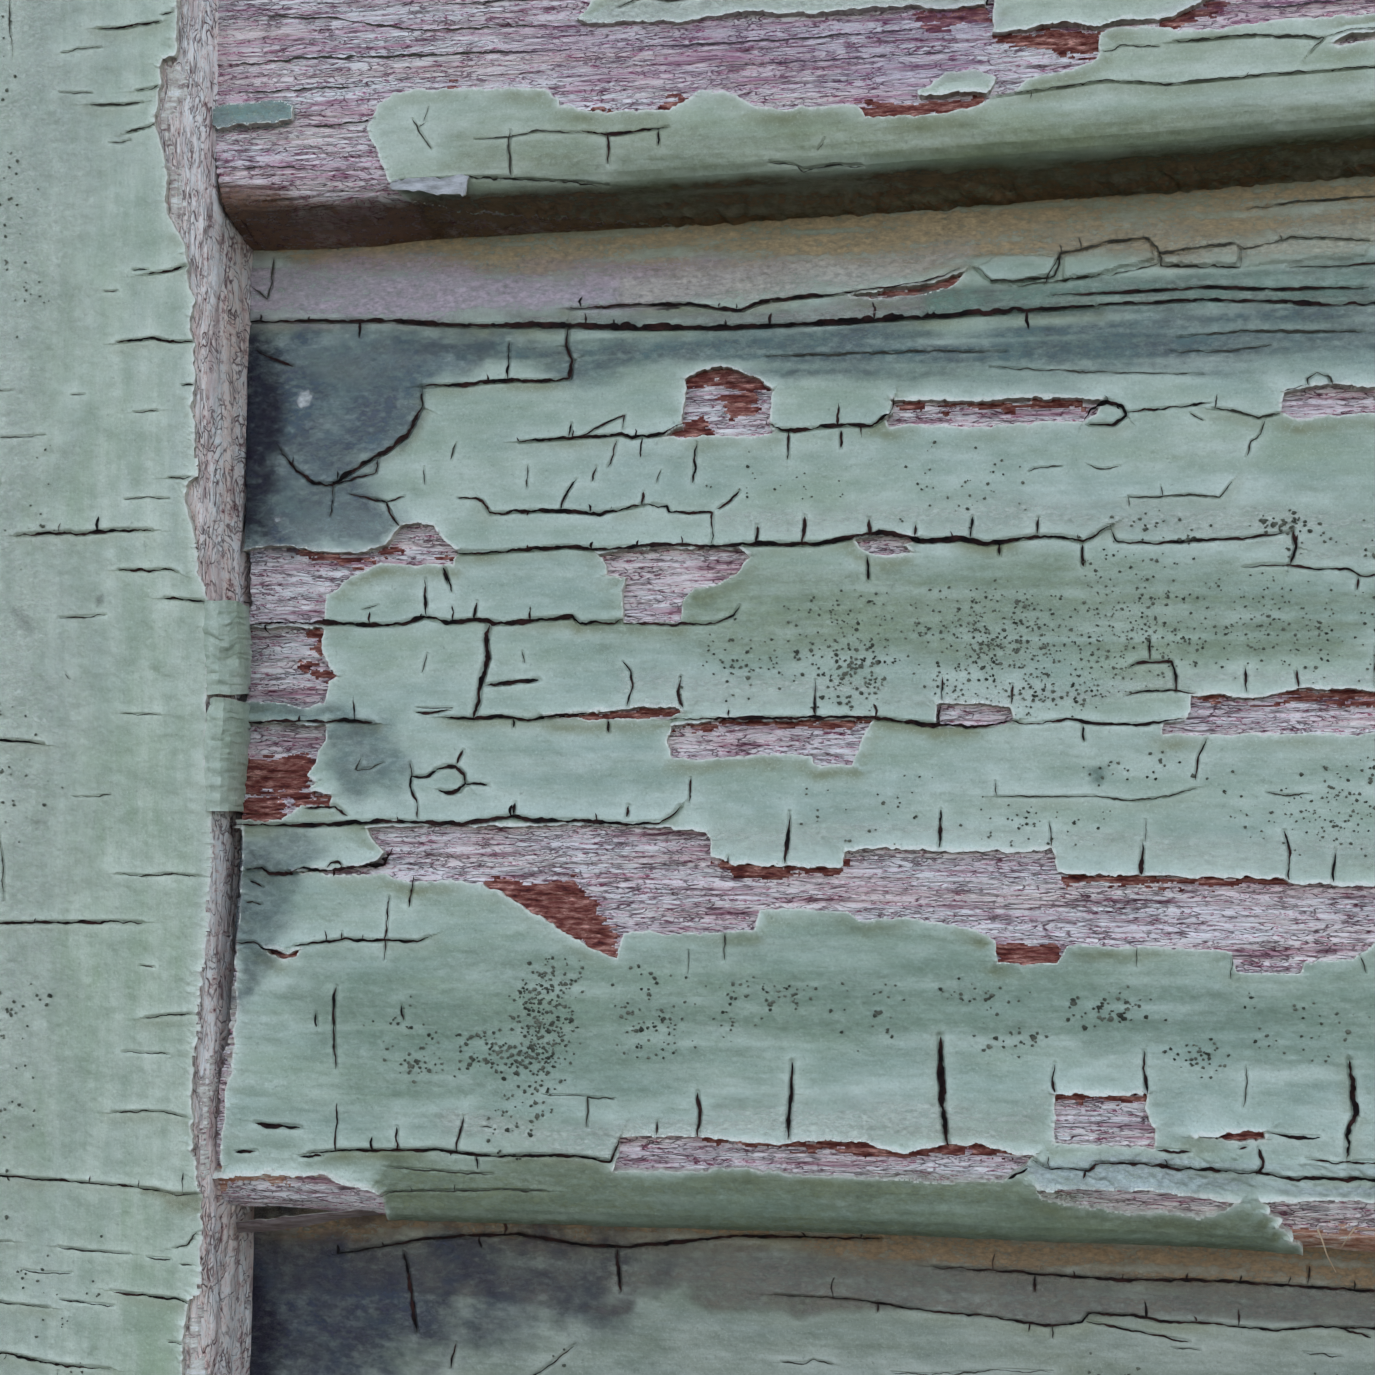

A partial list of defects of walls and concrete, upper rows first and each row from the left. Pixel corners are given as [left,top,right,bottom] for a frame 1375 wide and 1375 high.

peeling [212,0,1375,248]
water stain [244,307,1375,551]
peeling [588,539,759,631]
crack [233,196,1375,960]
peeling [146,0,466,1375]
peeling [284,810,1375,982]
crack [236,1094,619,1197]
crack [937,1037,949,1146]
peeling [602,1051,1375,1256]
crack [1008,1061,1375,1183]
water stain [251,1206,600,1375]
crack [780,1254,1375,1358]